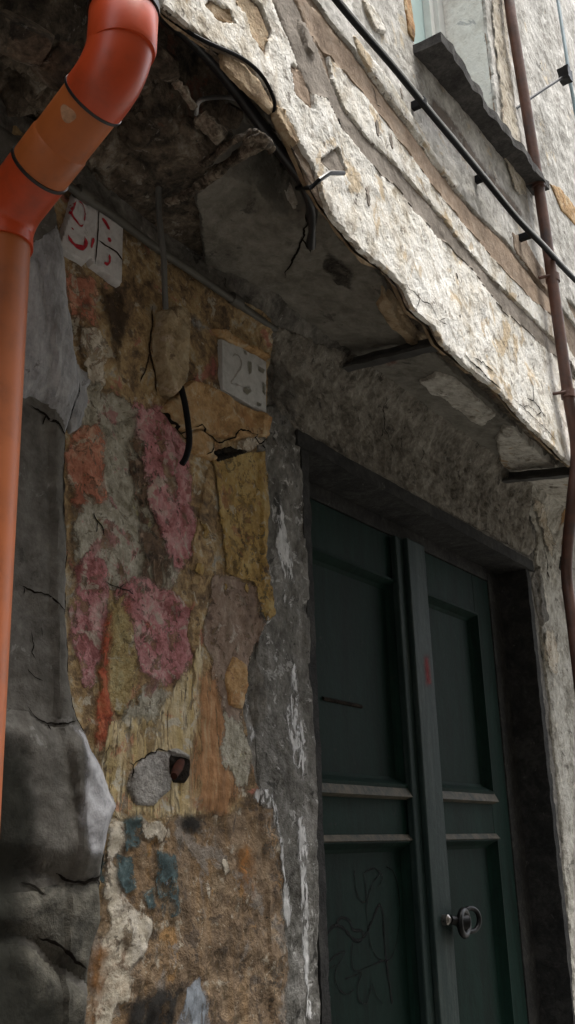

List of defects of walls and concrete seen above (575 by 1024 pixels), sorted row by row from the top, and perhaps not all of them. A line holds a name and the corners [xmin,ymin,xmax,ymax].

crack [284,214,311,275]
crack [140,306,266,454]
crack [30,383,80,568]
crack [28,646,83,730]
peeling [64,270,289,1024]
water stain [286,663,306,780]
water stain [255,789,313,1019]